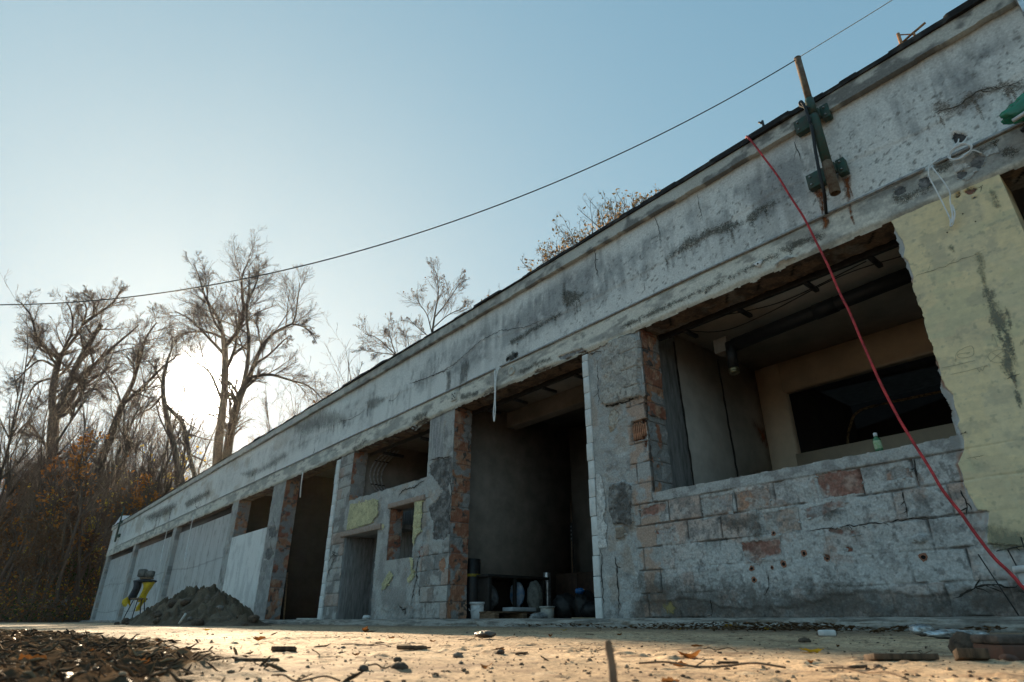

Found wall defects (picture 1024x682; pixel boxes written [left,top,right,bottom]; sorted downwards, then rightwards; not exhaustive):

damp [933,80,1024,125]
corrosion [843,177,854,224]
damp [977,255,1021,407]
flaking render [631,418,648,453]
spalling [407,457,453,583]
spalling [596,474,666,549]
crack [811,459,972,531]